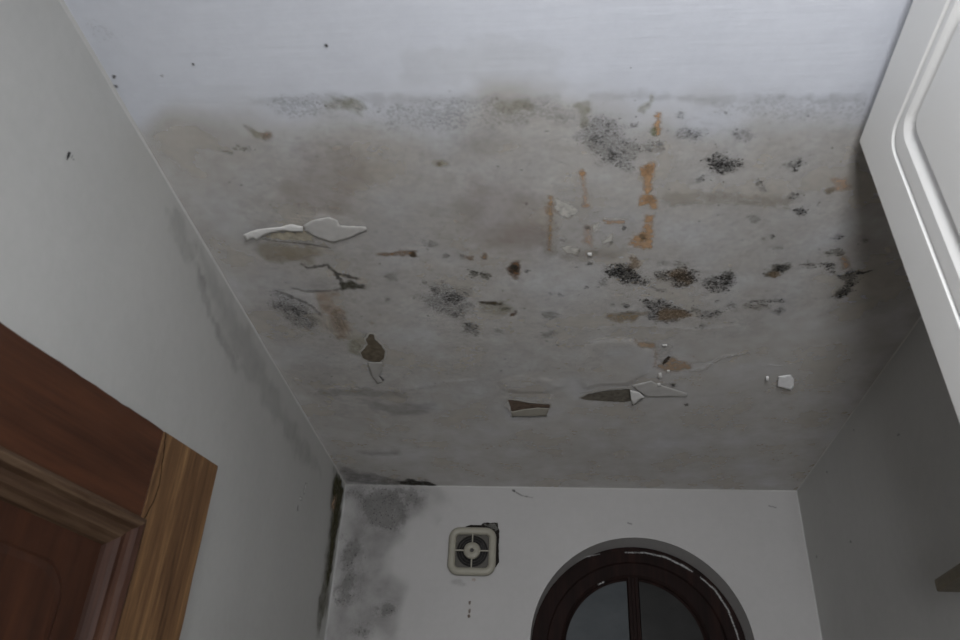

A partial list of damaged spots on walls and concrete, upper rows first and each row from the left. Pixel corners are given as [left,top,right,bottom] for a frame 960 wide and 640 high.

rust [631,163,656,248]
peeling [244,217,368,243]
crack [307,265,364,290]
leakage [607,257,639,280]
spalling [359,332,387,384]
spalling [579,342,690,406]
peeling [766,375,794,390]
spalling [504,399,552,416]
leakage [320,475,344,616]